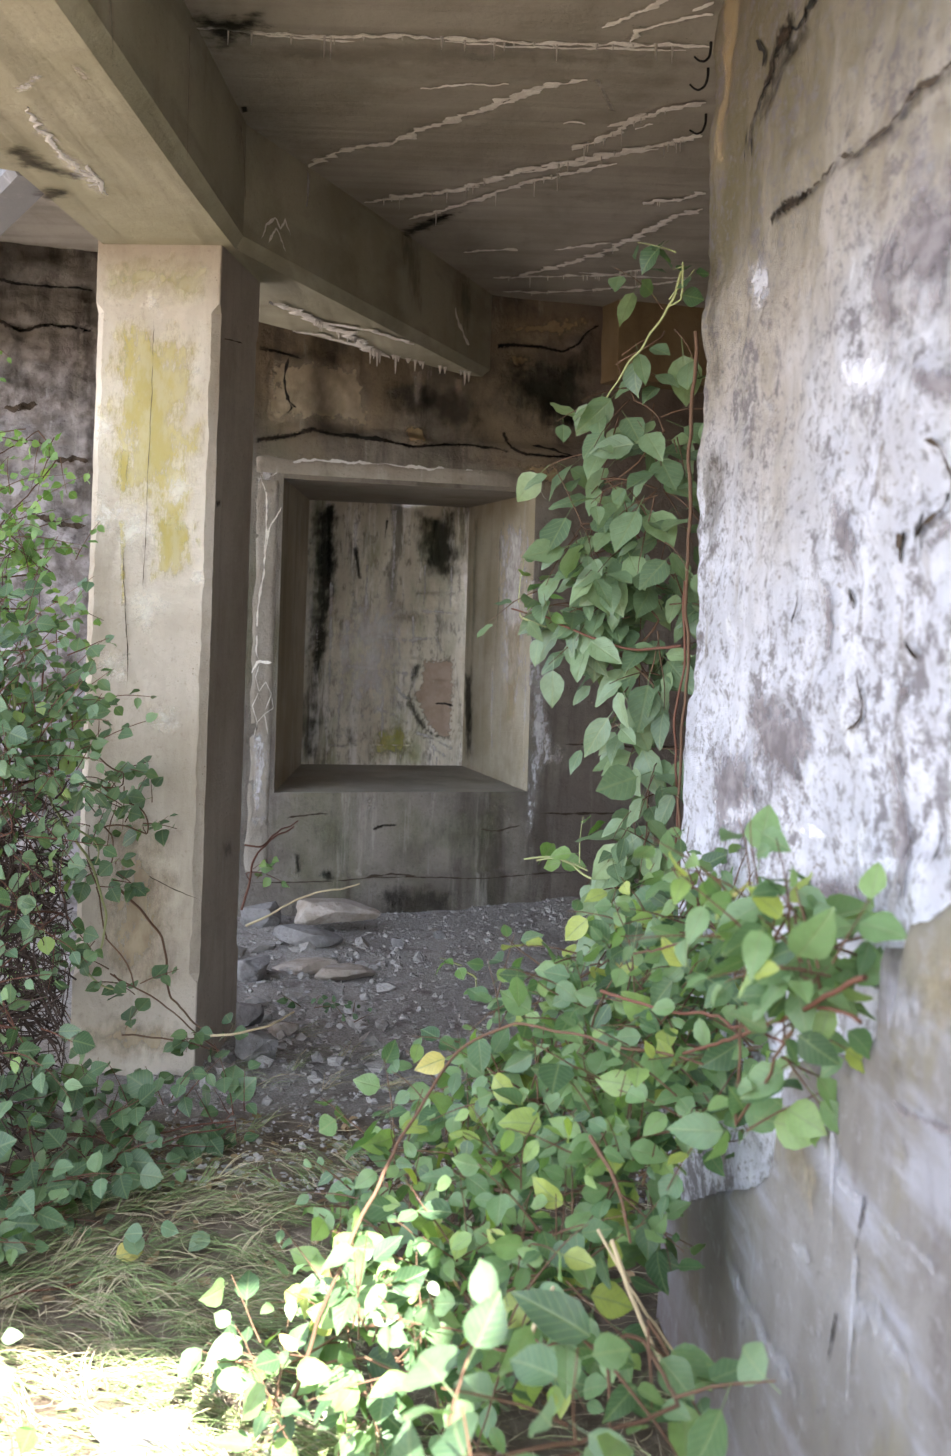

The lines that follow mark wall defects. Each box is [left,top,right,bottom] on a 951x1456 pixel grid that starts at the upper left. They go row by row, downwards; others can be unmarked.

crack [25,107,108,196]
leakage [194,13,260,48]
crack [197,0,714,168]
crack [364,102,706,224]
crack [744,0,816,183]
crack [770,61,951,225]
crack [225,191,706,734]
leakage [418,513,458,579]
leakage [307,505,414,756]